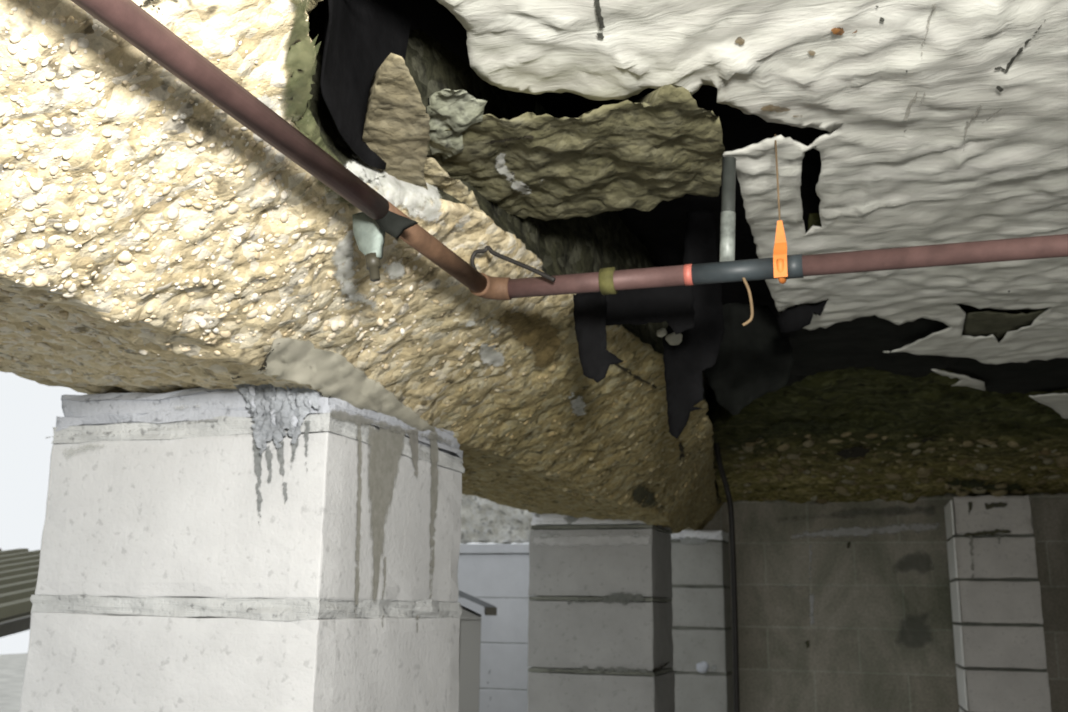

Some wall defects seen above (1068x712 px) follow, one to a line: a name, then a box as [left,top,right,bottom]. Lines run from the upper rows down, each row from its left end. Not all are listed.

spalling [303,0,323,14]
spalling [362,53,725,221]
spalling [498,311,563,371]
leakage [234,384,451,610]